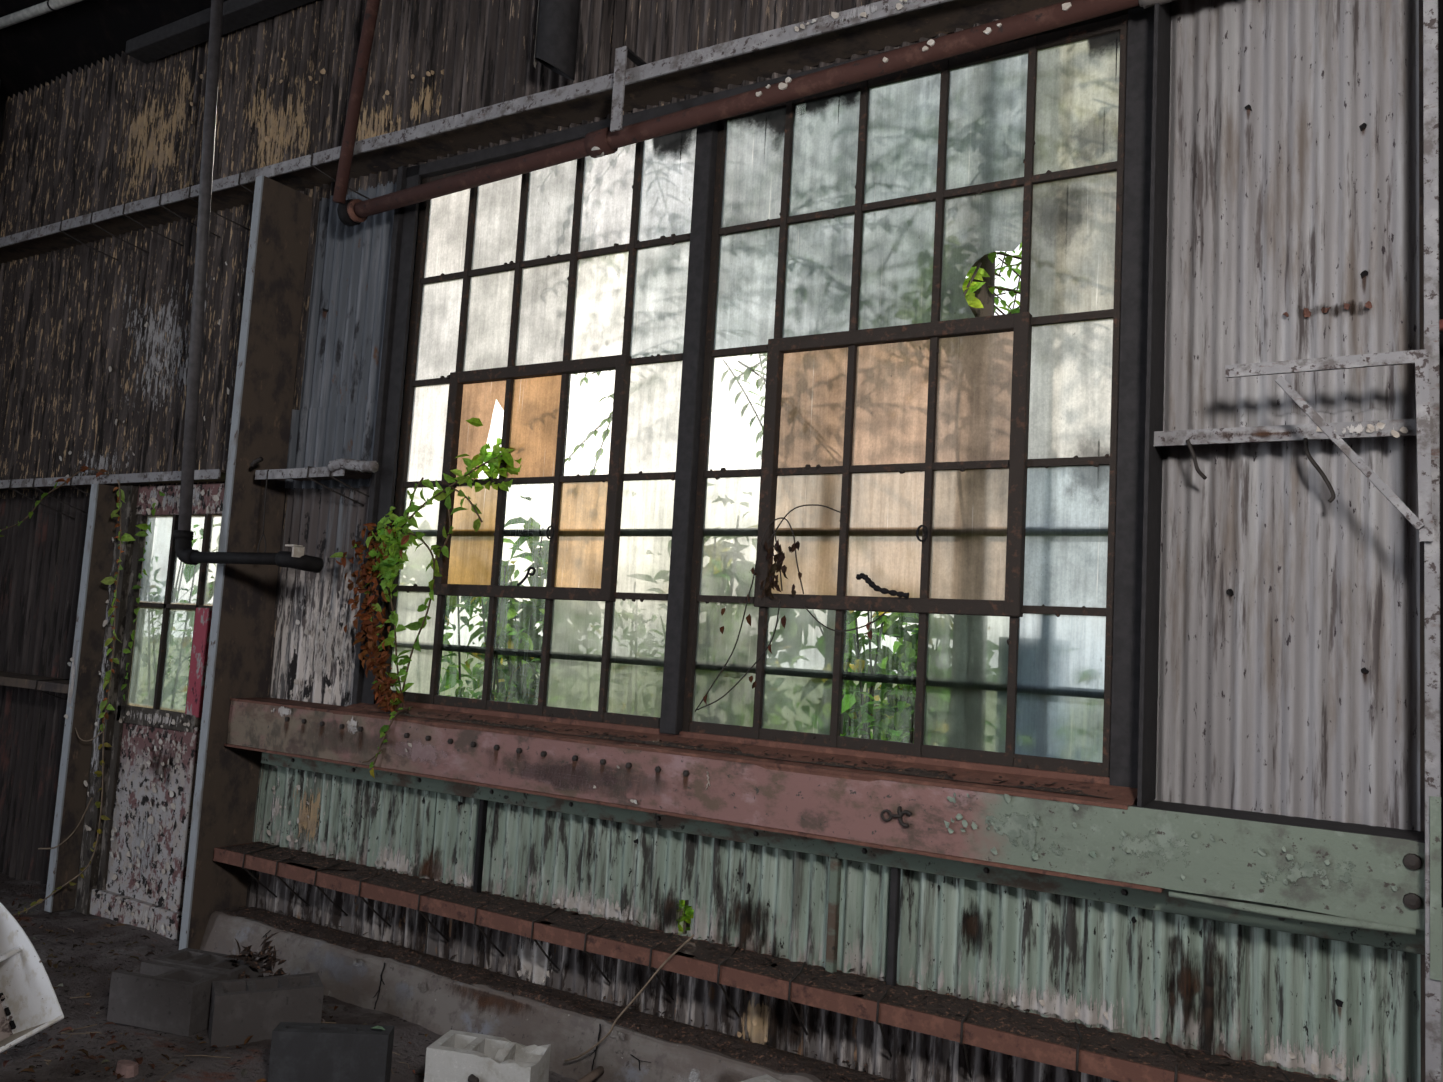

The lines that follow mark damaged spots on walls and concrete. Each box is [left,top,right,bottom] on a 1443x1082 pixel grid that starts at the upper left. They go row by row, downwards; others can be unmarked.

peeling [293,590,360,694]